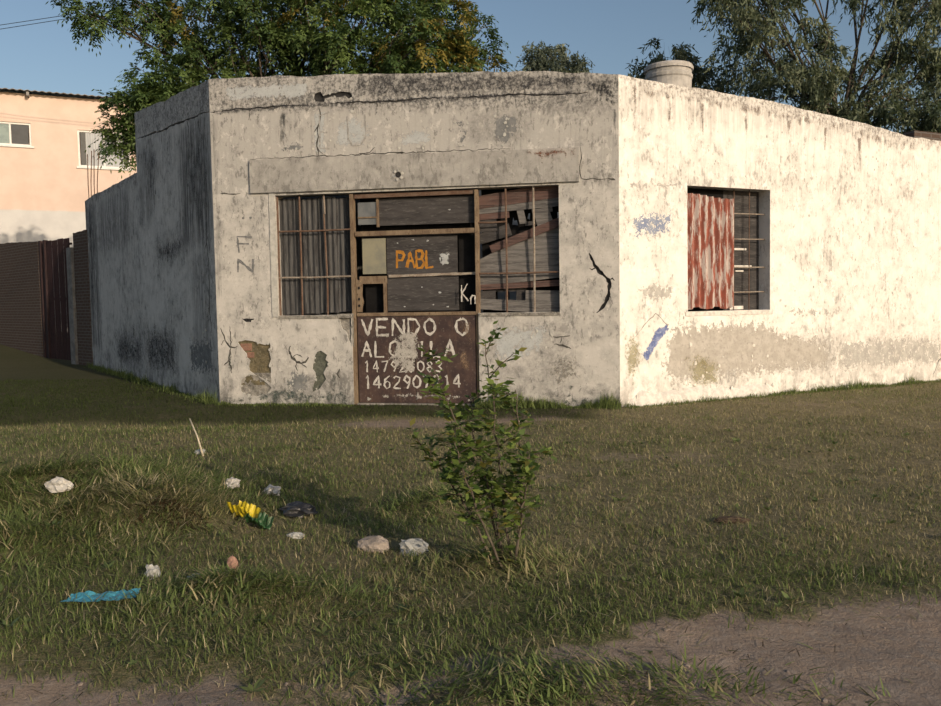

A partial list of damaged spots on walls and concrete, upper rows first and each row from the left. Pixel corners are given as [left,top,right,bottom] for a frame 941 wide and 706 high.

crack [466,89,587,99]
crack [138,98,505,373]
crack [589,253,615,313]
spalling [237,340,272,397]
spalling [289,351,330,392]